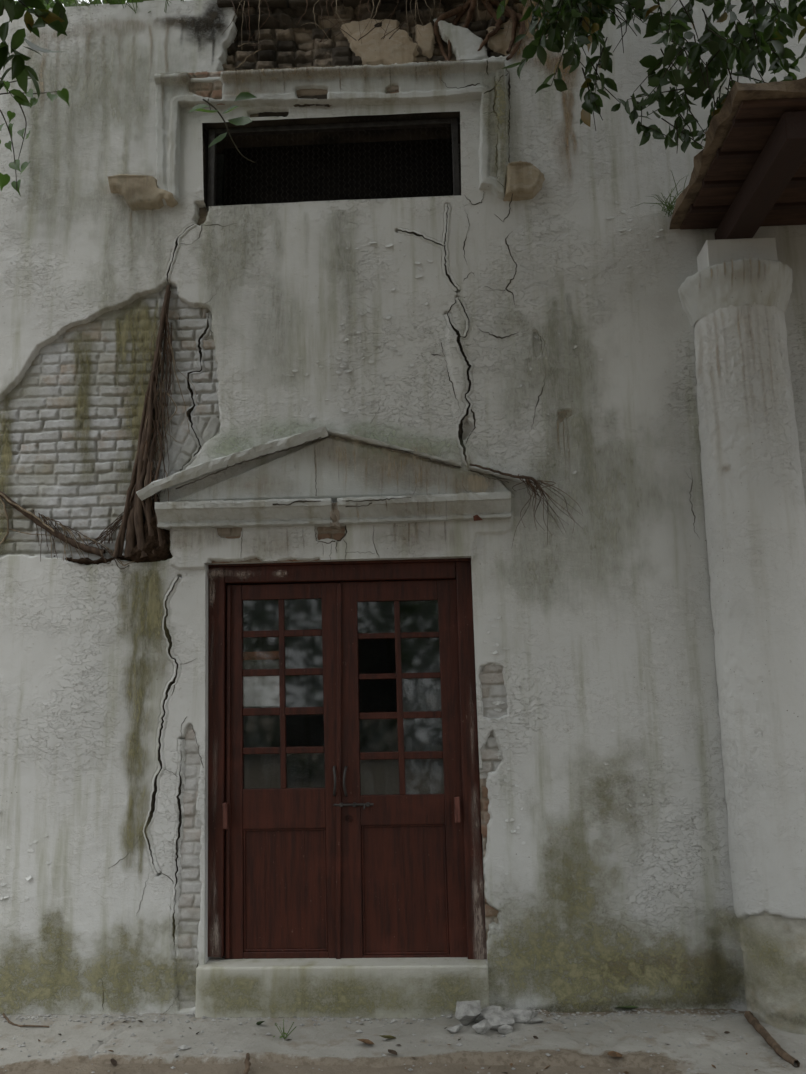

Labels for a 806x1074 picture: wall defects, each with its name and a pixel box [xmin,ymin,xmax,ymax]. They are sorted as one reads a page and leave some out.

damp [165,2,226,56]
spalling [187,0,524,105]
spalling [0,285,221,560]
crack [164,223,236,284]
crack [158,282,321,505]
crack [315,60,546,560]
crack [113,576,203,1014]
damp [546,937,740,1012]